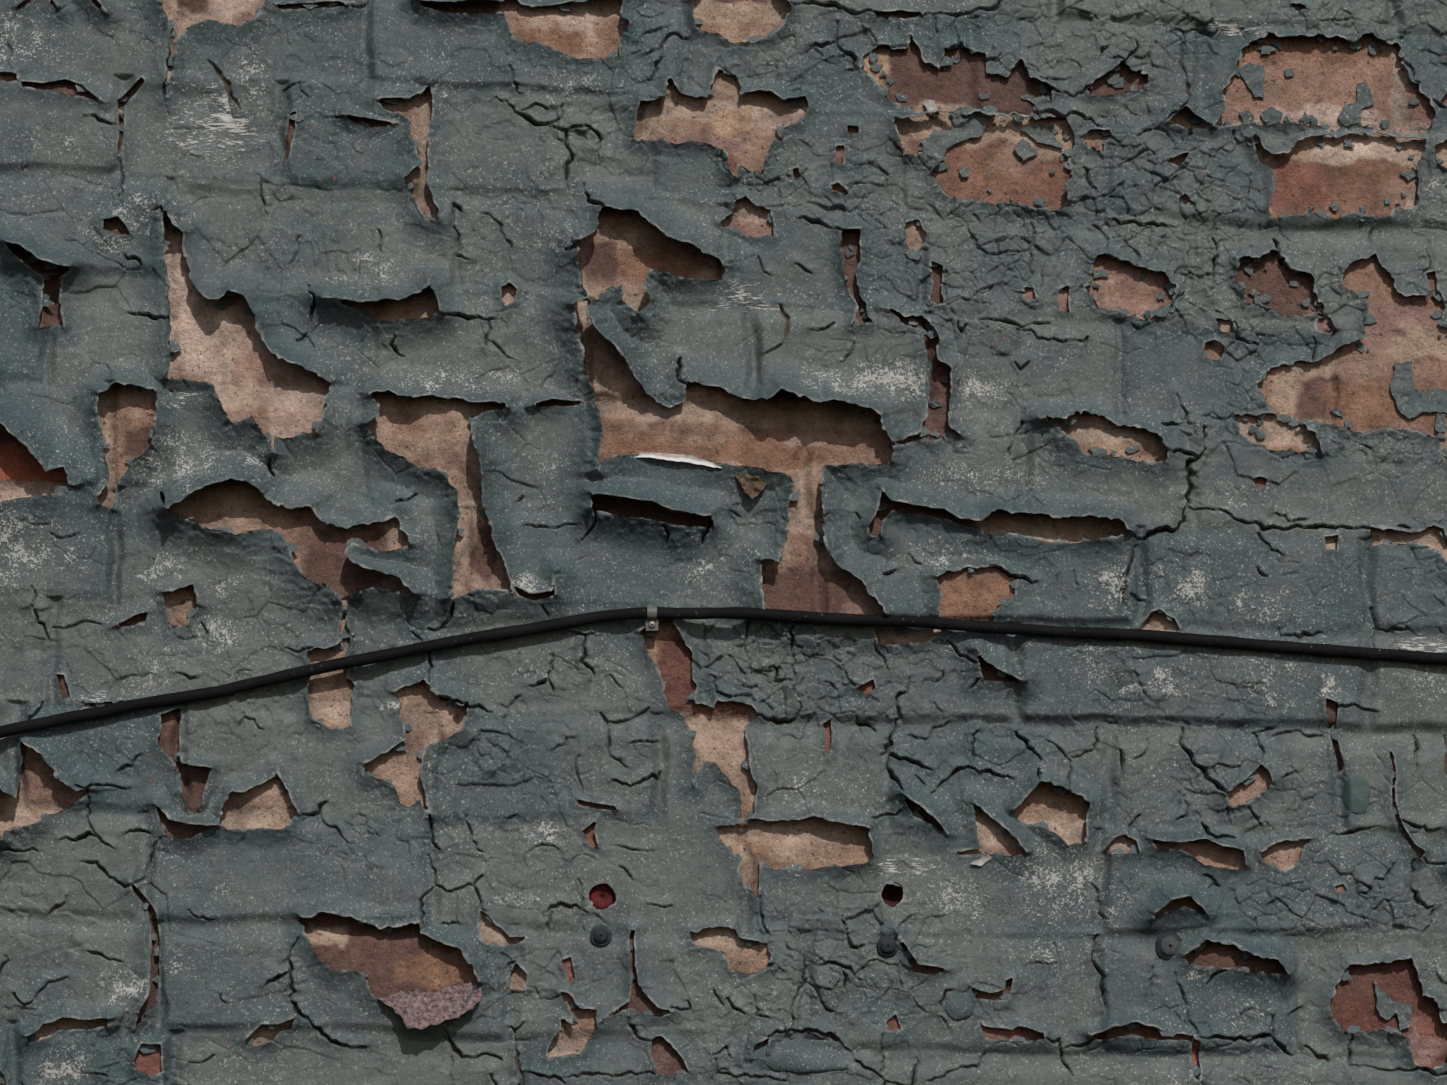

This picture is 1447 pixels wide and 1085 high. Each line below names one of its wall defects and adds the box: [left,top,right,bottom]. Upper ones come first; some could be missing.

peeling [1169,33,1447,222]
peeling [97,211,330,508]
peeling [367,392,555,600]
peeling [536,206,1021,646]
crack [1120,409,1205,604]
crack [1229,514,1406,576]
peeling [1235,251,1447,460]
crack [856,645,999,784]
crack [66,812,154,888]
crack [268,958,346,1046]
peeling [299,912,482,1030]
crack [731,910,985,1085]